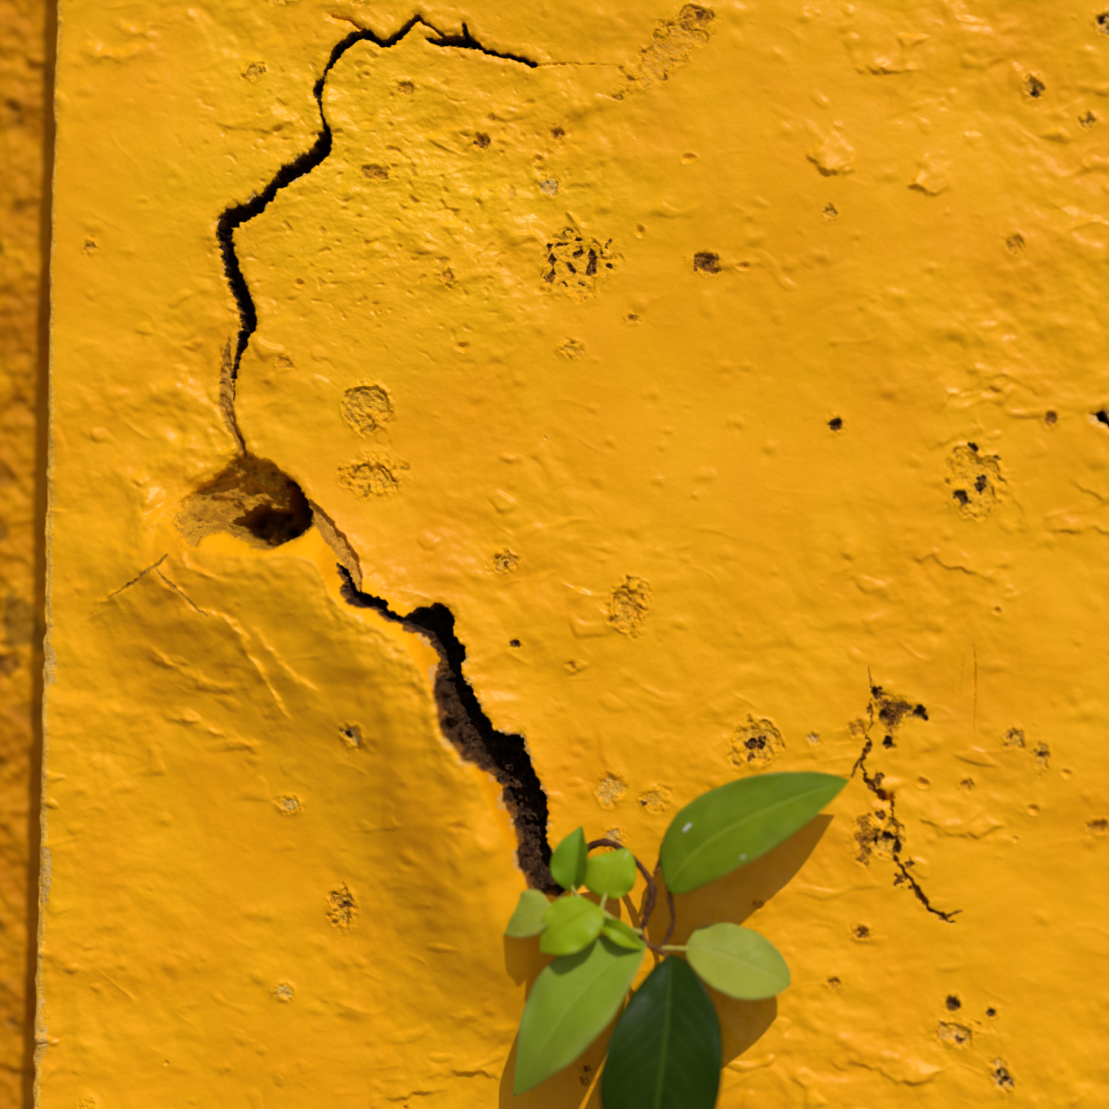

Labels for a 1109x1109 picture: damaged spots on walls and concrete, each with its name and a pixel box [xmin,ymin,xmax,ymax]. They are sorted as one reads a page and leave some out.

peeling [606,3,722,103]
spalling [536,222,626,304]
crack [164,15,619,899]
spalling [941,437,1008,522]
spalling [727,714,786,771]
crack [851,666,895,822]
crack [893,855,962,924]